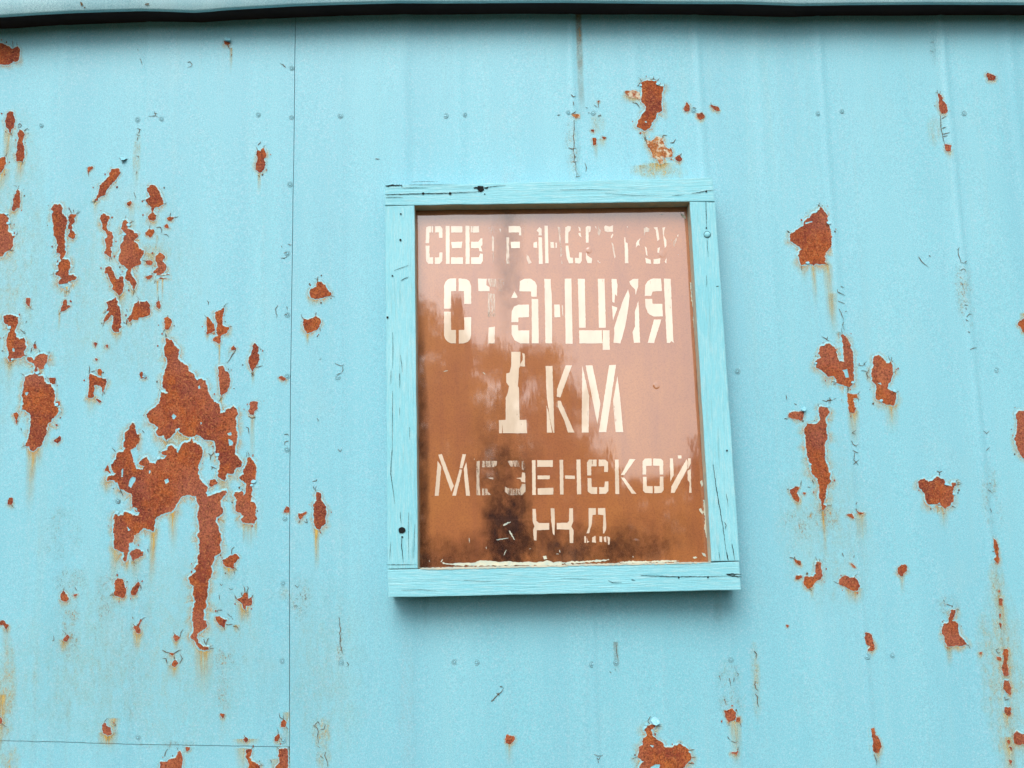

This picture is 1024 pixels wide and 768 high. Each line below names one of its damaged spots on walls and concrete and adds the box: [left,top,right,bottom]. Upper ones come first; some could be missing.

corrosion [0,110,28,177]
corrosion [624,76,676,175]
corrosion [47,202,78,315]
corrosion [788,203,836,275]
corrosion [301,275,334,337]
corrosion [0,313,61,464]
corrosion [93,157,263,662]
corrosion [814,329,899,417]
corrosion [784,396,835,528]
corrosion [917,471,960,514]
corrosion [940,600,970,651]
corrosion [633,717,696,768]